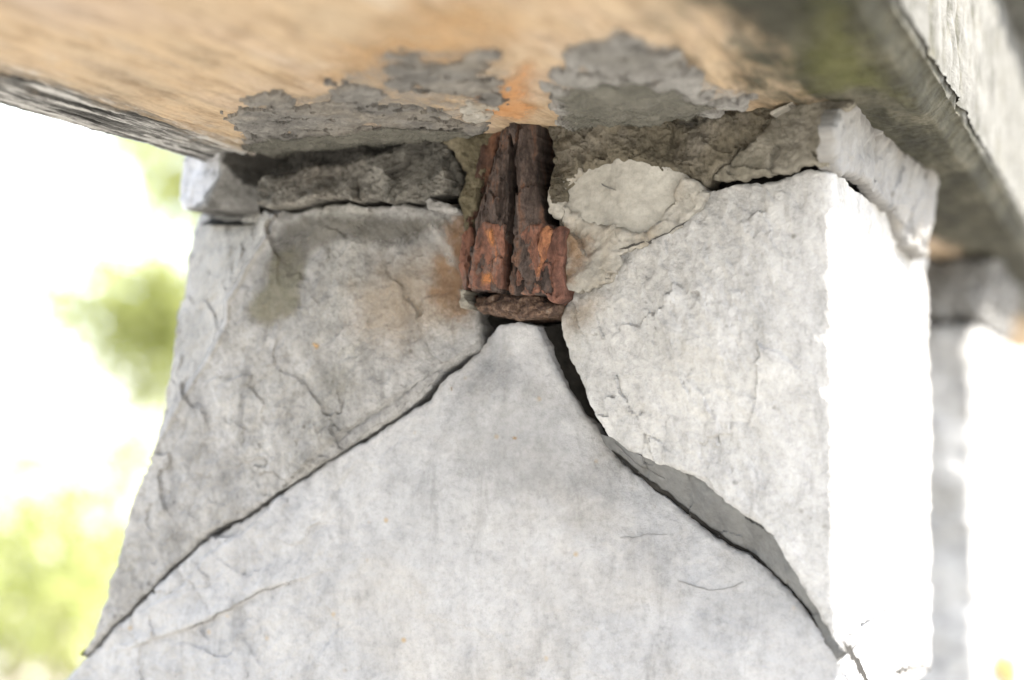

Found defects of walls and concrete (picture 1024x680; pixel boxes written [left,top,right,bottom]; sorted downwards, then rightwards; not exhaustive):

corrosion [338,9,507,79]
peeling [383,46,511,124]
corrosion [485,67,535,119]
peeling [770,102,796,118]
crack [712,165,822,191]
crack [200,206,275,226]
corrosion [431,218,583,314]
crack [328,370,451,455]
crack [487,242,868,680]
crack [188,584,283,629]
crack [894,662,931,676]